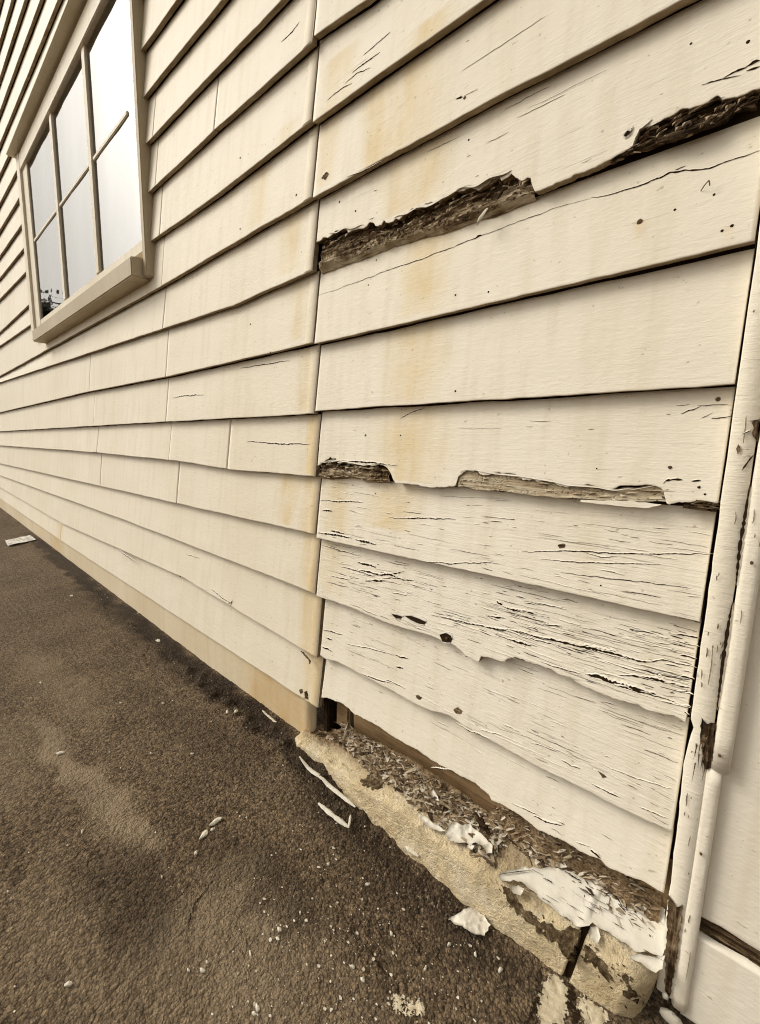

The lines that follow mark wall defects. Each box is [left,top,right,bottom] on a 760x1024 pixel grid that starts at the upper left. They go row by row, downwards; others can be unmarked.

peeling [394,170,511,218]
crack [317,151,757,296]
peeling [461,470,661,508]
crack [318,499,499,582]
crack [441,406,754,715]
crack [321,629,409,689]
spalling [359,769,385,791]
peeling [417,813,445,832]
peeling [449,907,491,936]
peeling [499,863,665,1010]
crack [525,924,591,1024]
peeling [659,991,683,1024]